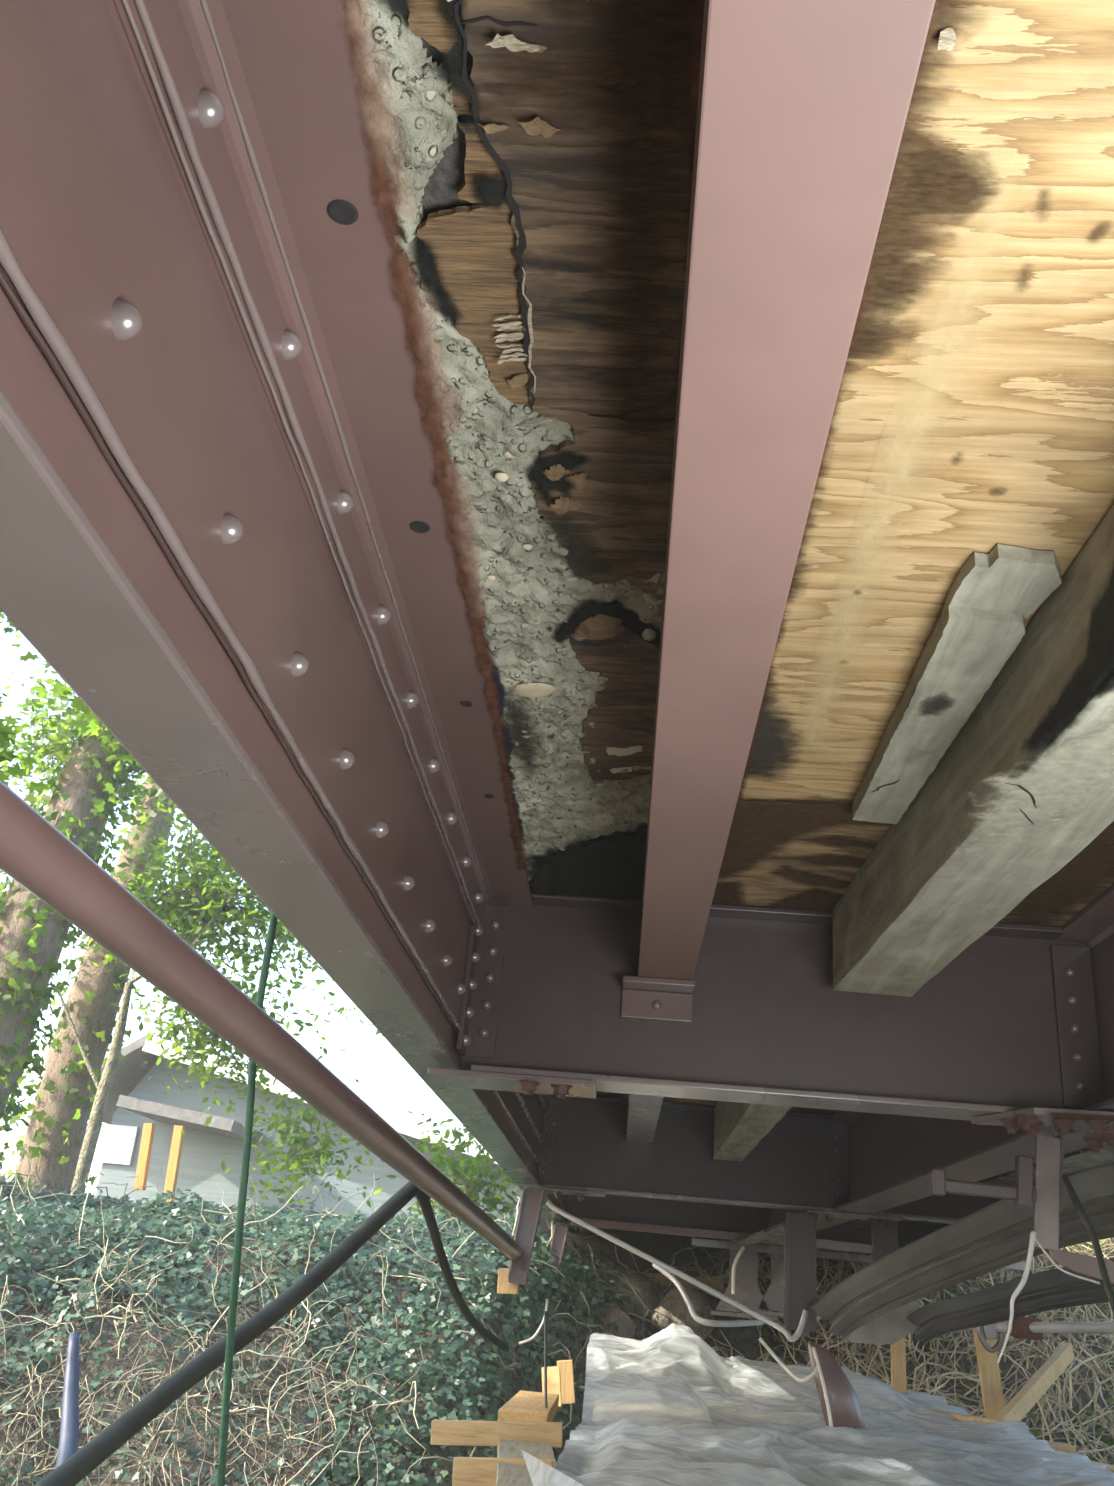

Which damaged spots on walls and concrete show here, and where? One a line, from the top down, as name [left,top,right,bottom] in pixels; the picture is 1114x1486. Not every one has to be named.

crack [454,0,538,413]
leakage [496,0,689,432]
leakage [843,0,983,373]
rust [343,0,527,871]
spalling [353,0,665,881]
leakage [491,666,647,901]
leakage [788,566,806,597]